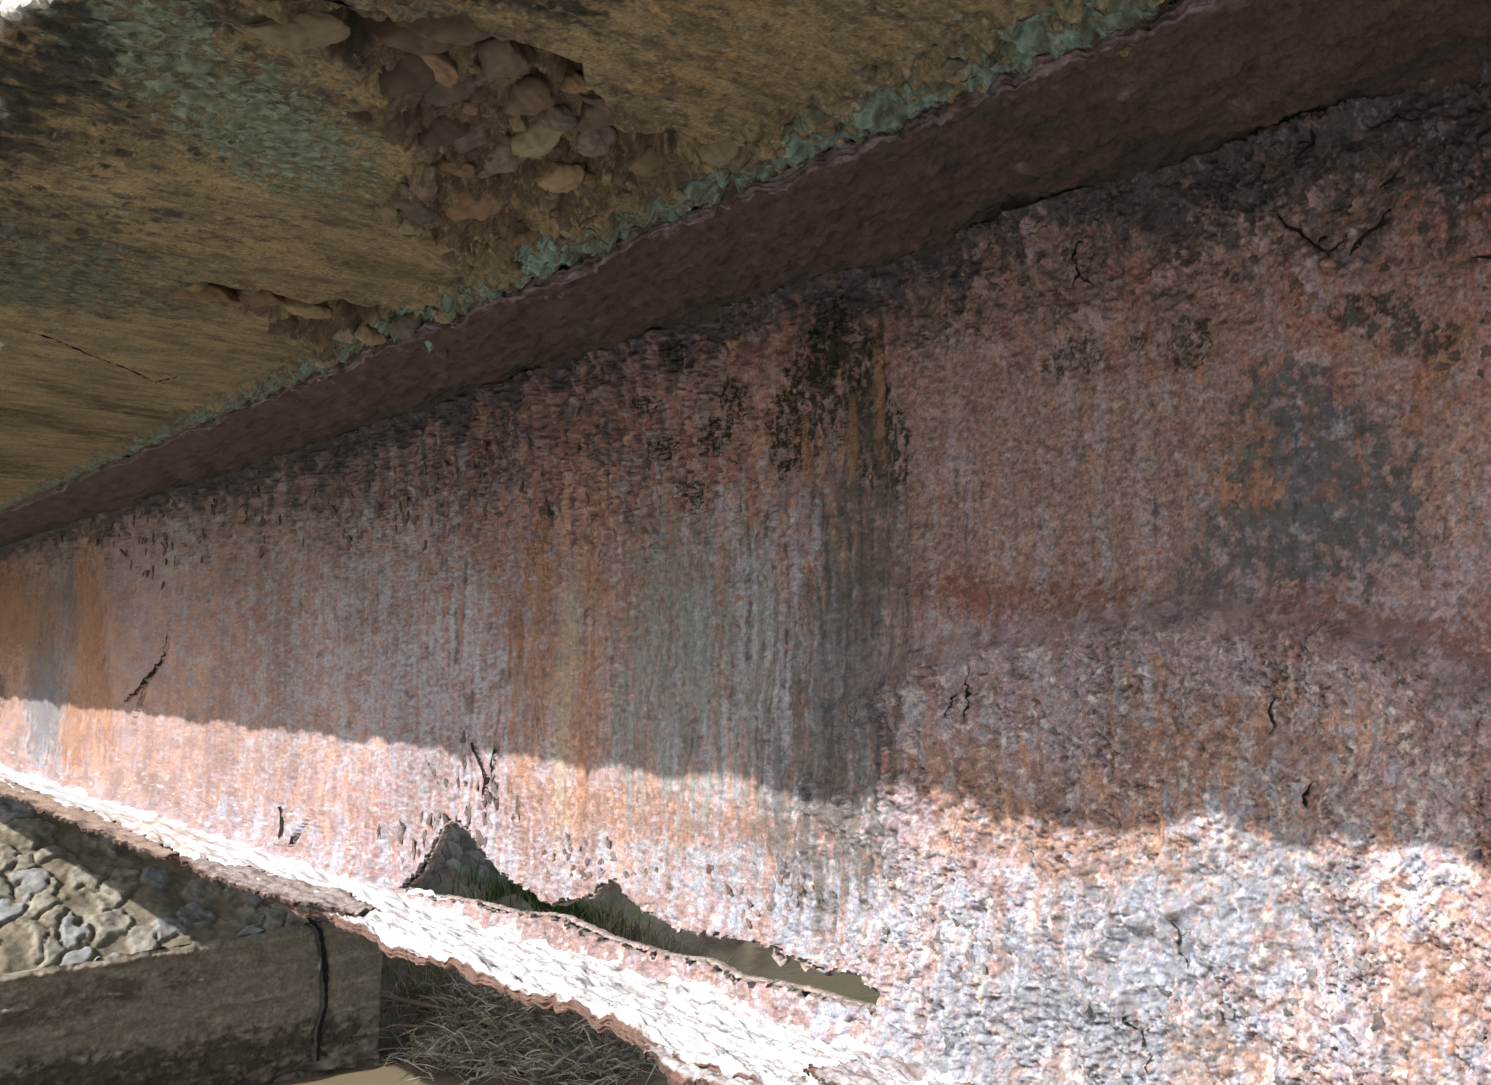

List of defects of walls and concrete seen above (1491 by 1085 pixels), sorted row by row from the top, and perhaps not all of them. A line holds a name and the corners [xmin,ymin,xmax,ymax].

leakage [0,1,119,167]
spalling [244,2,705,275]
crack [1277,169,1400,257]
crack [23,331,198,391]
leakage [765,295,913,506]
crack [124,633,168,712]
corrosion [377,730,521,865]
corrosion [541,832,673,893]
corrosion [725,849,838,928]
crack [307,918,329,1061]
corrosion [643,1043,763,1085]
corrosion [787,1055,975,1085]